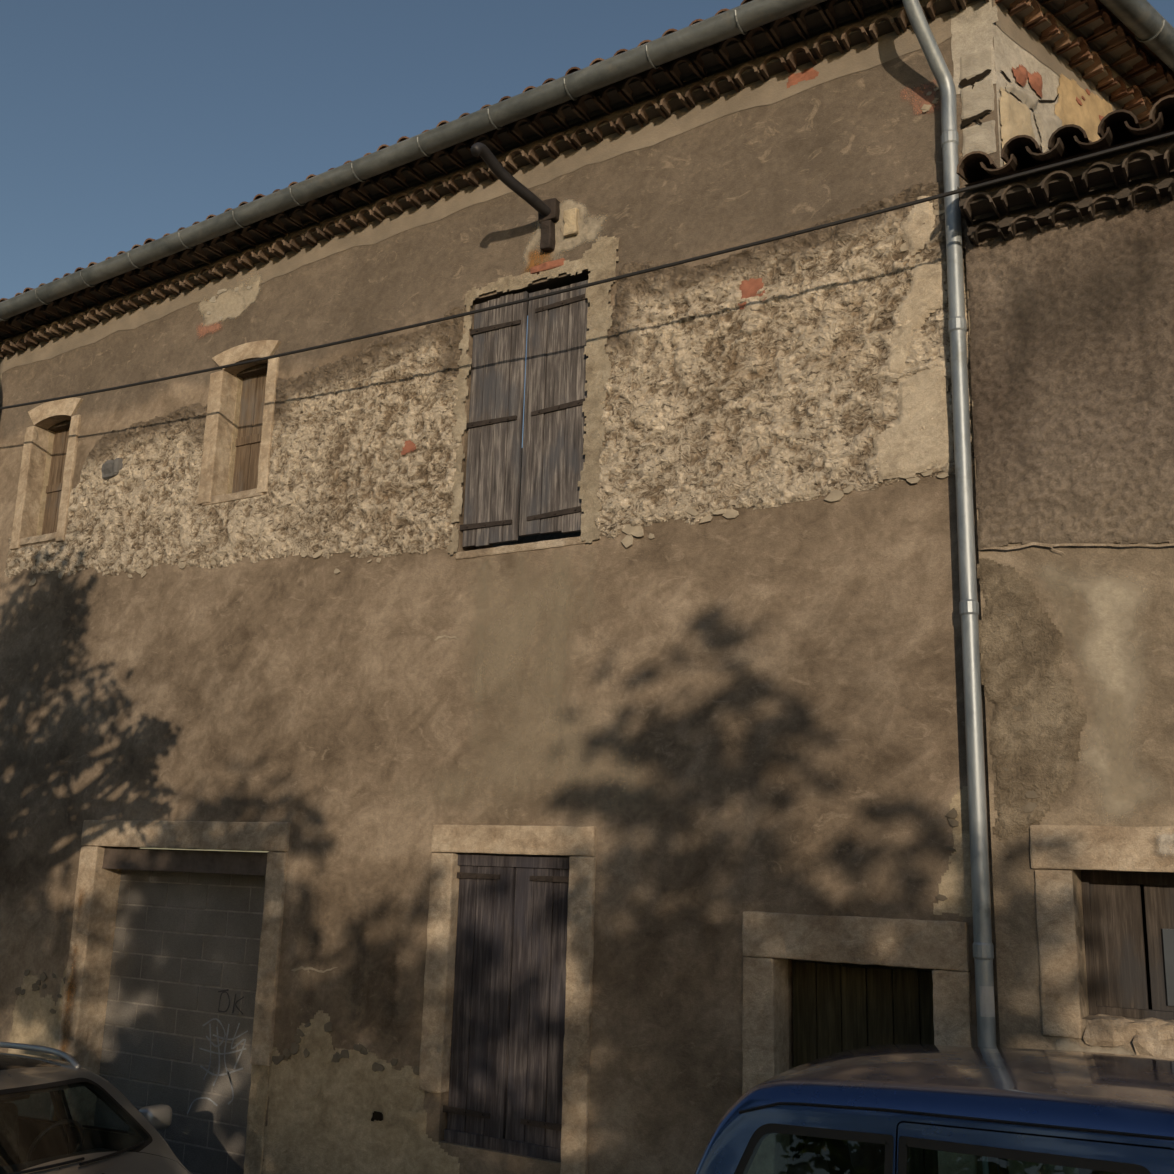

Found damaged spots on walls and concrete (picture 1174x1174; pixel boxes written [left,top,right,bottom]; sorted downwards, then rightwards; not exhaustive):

flaking render [999,64,1113,153]
flaking render [198,275,261,336]
flaking render [523,200,605,266]
flaking render [594,176,955,548]
flaking render [961,211,975,466]
flaking render [4,306,466,586]
crack [984,542,1174,553]
flaking render [262,1010,460,1174]